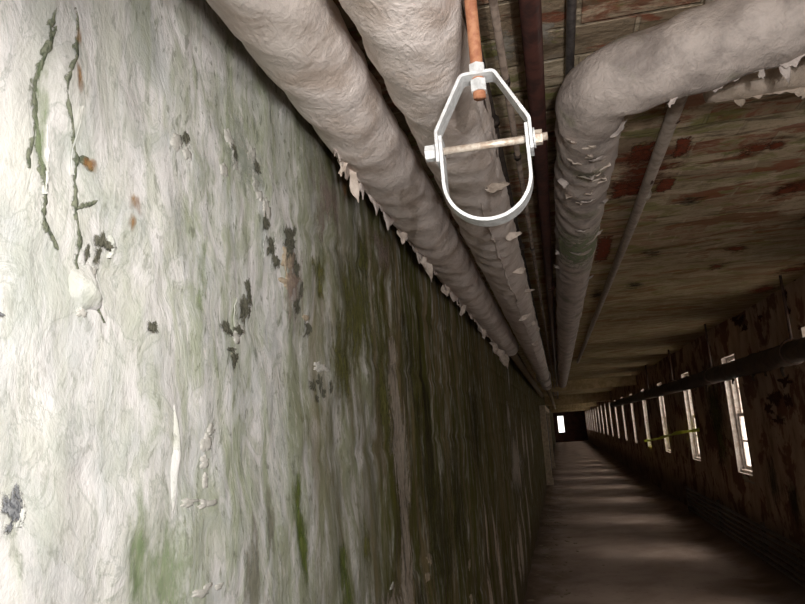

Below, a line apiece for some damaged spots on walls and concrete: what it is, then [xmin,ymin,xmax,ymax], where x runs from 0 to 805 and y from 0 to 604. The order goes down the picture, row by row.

peeling [170,131,192,161]
peeling [557,136,691,205]
peeling [220,128,312,337]
peeling [575,228,614,263]
spalling [220,278,253,371]
leakage [330,325,351,409]
leakage [375,315,466,604]
spalling [2,483,27,532]
leakage [483,403,534,604]
leakage [300,525,308,581]